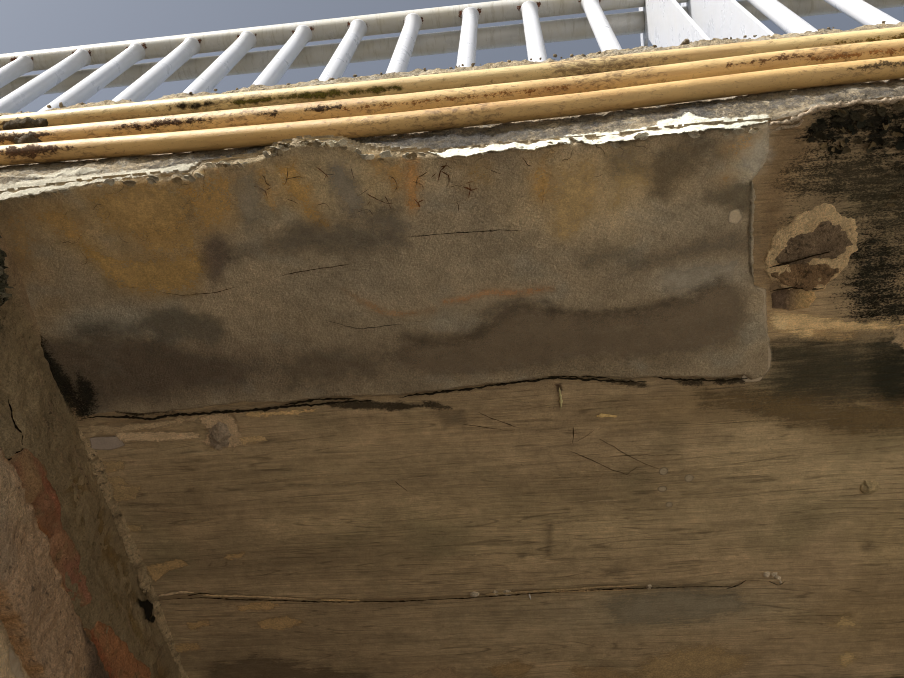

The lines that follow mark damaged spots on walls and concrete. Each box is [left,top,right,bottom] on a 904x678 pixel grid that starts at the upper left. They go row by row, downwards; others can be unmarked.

water stain [356,117,628,149]
peeling [263,95,904,161]
spalling [21,188,71,198]
spalling [97,175,159,187]
water stain [640,86,904,436]
water stain [400,262,744,373]
water stain [41,311,244,421]
crack [84,376,748,420]
crack [8,399,23,460]
crack [165,580,784,603]